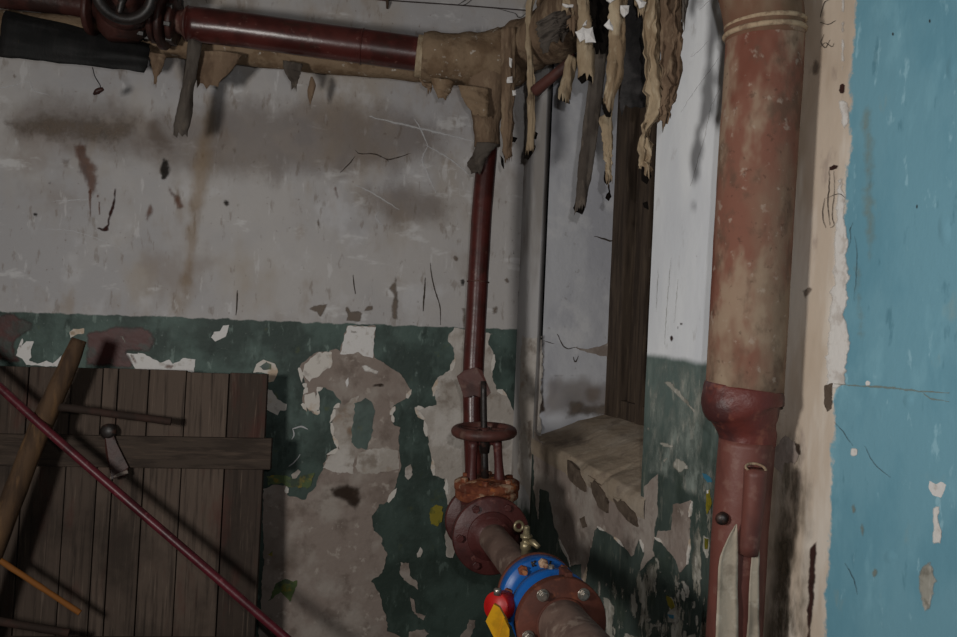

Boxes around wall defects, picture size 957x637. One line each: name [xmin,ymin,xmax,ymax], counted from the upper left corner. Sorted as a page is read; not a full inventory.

spalling [575,19,613,43]
spalling [606,0,646,17]
rust [77,146,100,214]
peeling [824,179,850,411]
peeling [0,314,62,367]
peeling [69,327,195,372]
peeling [211,325,229,341]
spalling [253,306,465,637]
spalling [484,333,712,637]
peeling [929,481,946,543]
water stain [767,512,797,637]
water stain [807,544,816,637]